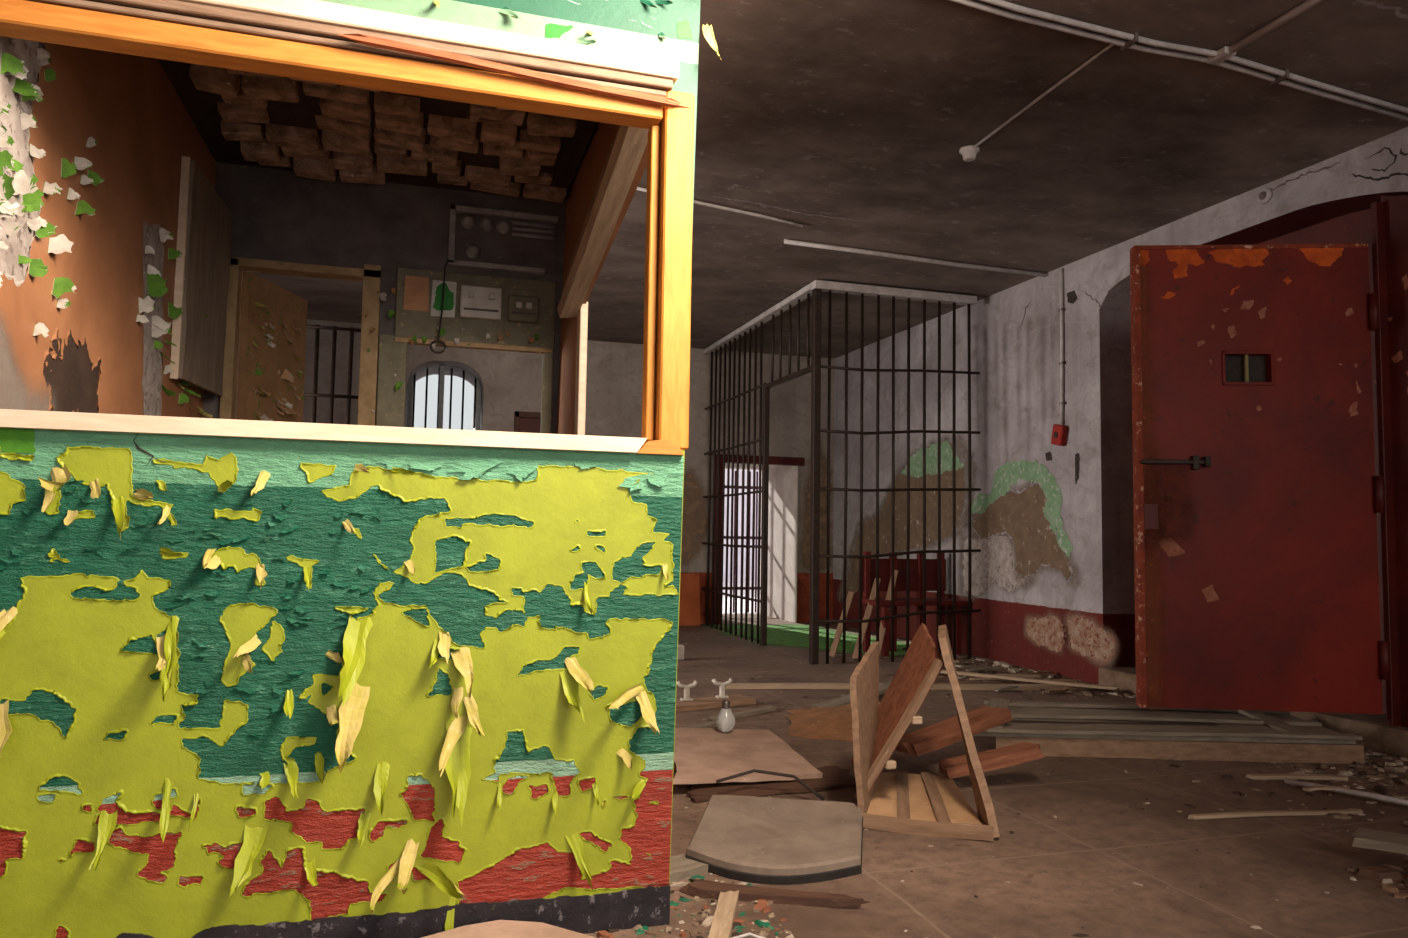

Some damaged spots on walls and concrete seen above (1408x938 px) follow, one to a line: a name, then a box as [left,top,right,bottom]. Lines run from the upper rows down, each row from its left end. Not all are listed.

peeling [576,31,597,45]
peeling [640,0,673,8]
peeling [702,24,721,60]
peeling [0,36,105,309]
crack [1270,147,1408,190]
flaking render [33,322,102,413]
peeling [136,221,213,418]
peeling [252,300,305,421]
flaking render [838,435,1080,601]
peeling [0,428,684,931]
peeling [1025,615,1116,666]
peeling [53,924,71,938]